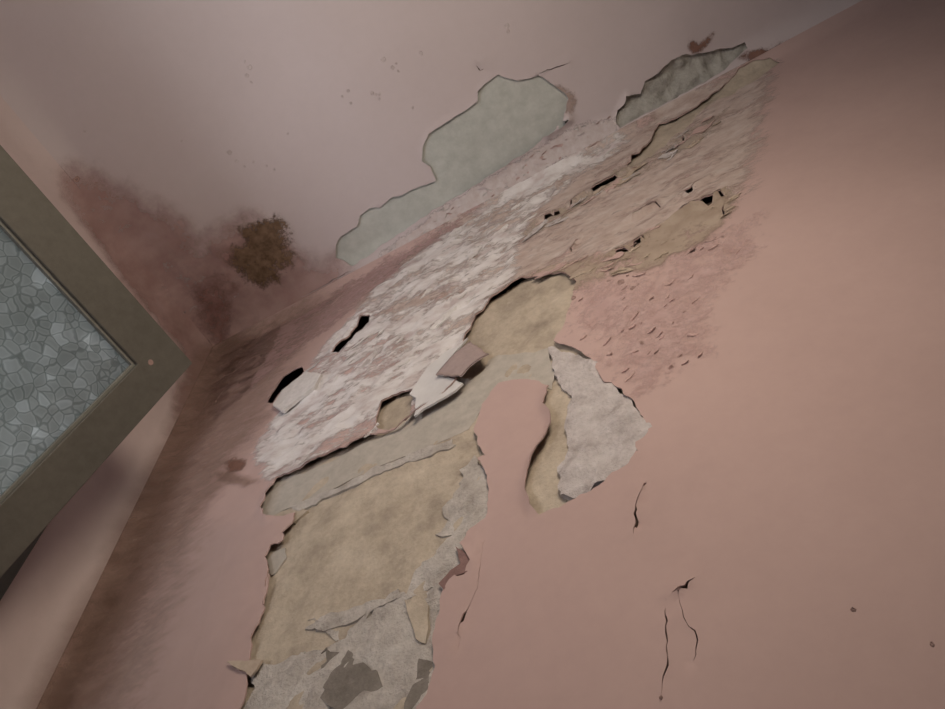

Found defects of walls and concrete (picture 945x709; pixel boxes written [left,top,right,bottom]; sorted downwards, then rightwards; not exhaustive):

leakage [36,133,630,709]
spalling [227,42,779,709]